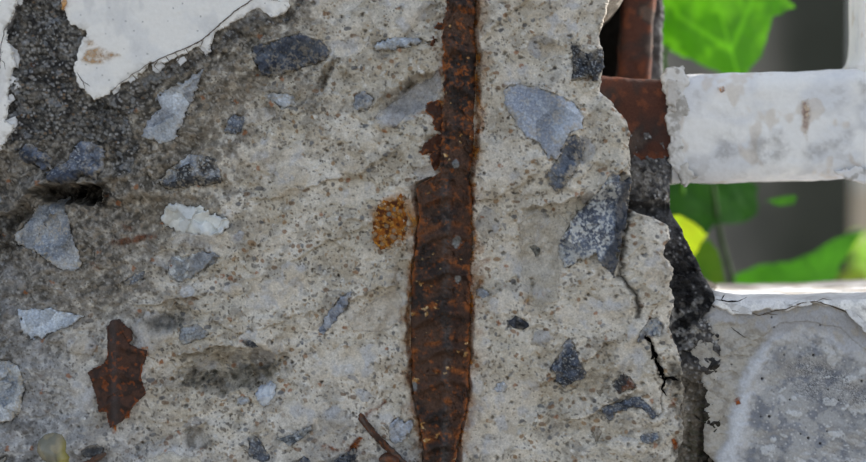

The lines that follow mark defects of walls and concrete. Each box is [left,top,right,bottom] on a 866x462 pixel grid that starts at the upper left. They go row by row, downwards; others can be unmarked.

spalling [5,0,214,175]
spalling [221,0,304,42]
rust [615,0,656,79]
peeling [660,66,698,187]
rust [372,193,416,250]
spalling [377,0,476,462]
spalling [519,213,567,310]
spalling [88,319,147,428]
crack [644,335,679,396]
spalling [748,349,866,462]
peeling [845,309,866,333]